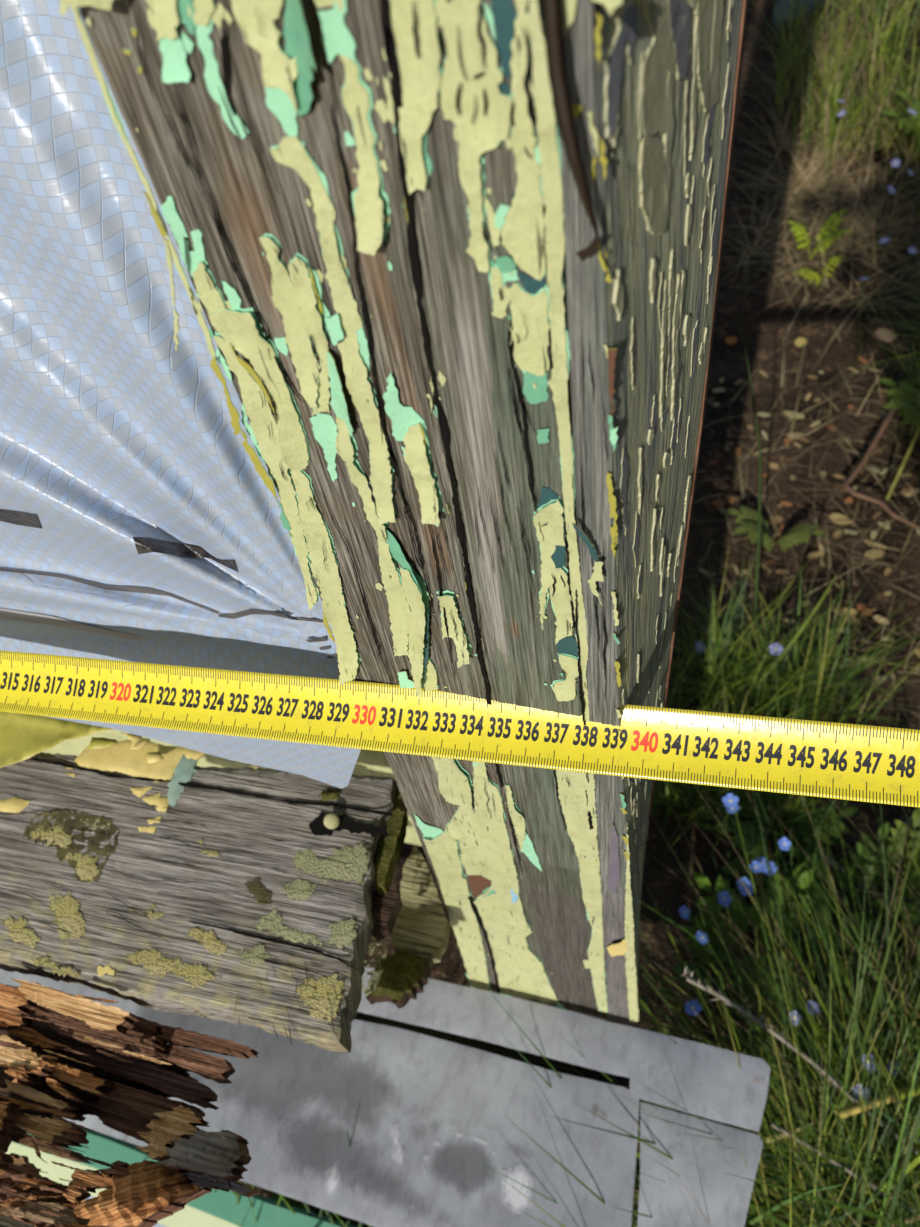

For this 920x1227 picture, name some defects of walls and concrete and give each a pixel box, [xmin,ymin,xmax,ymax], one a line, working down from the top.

peeling [59,0,724,723]
peeling [414,756,567,1011]
peeling [556,770,651,1023]